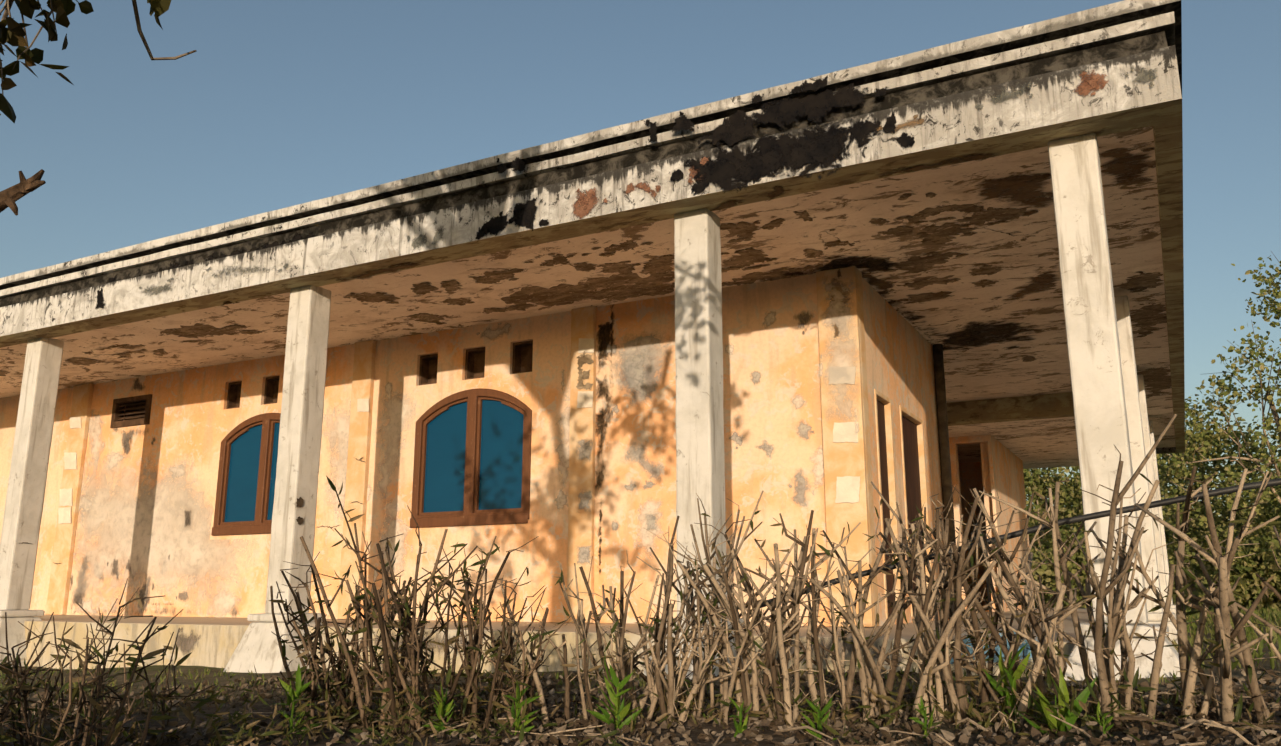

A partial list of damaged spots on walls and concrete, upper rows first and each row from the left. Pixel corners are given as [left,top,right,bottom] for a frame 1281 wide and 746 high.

leakage [645,75,915,211]
leakage [880,154,999,177]
leakage [976,173,1054,216]
peeling [344,240,675,339]
peeling [720,210,855,286]
peeling [869,193,1030,304]
peeling [1119,271,1167,337]
flaking render [555,335,668,509]
flaking render [788,396,824,505]